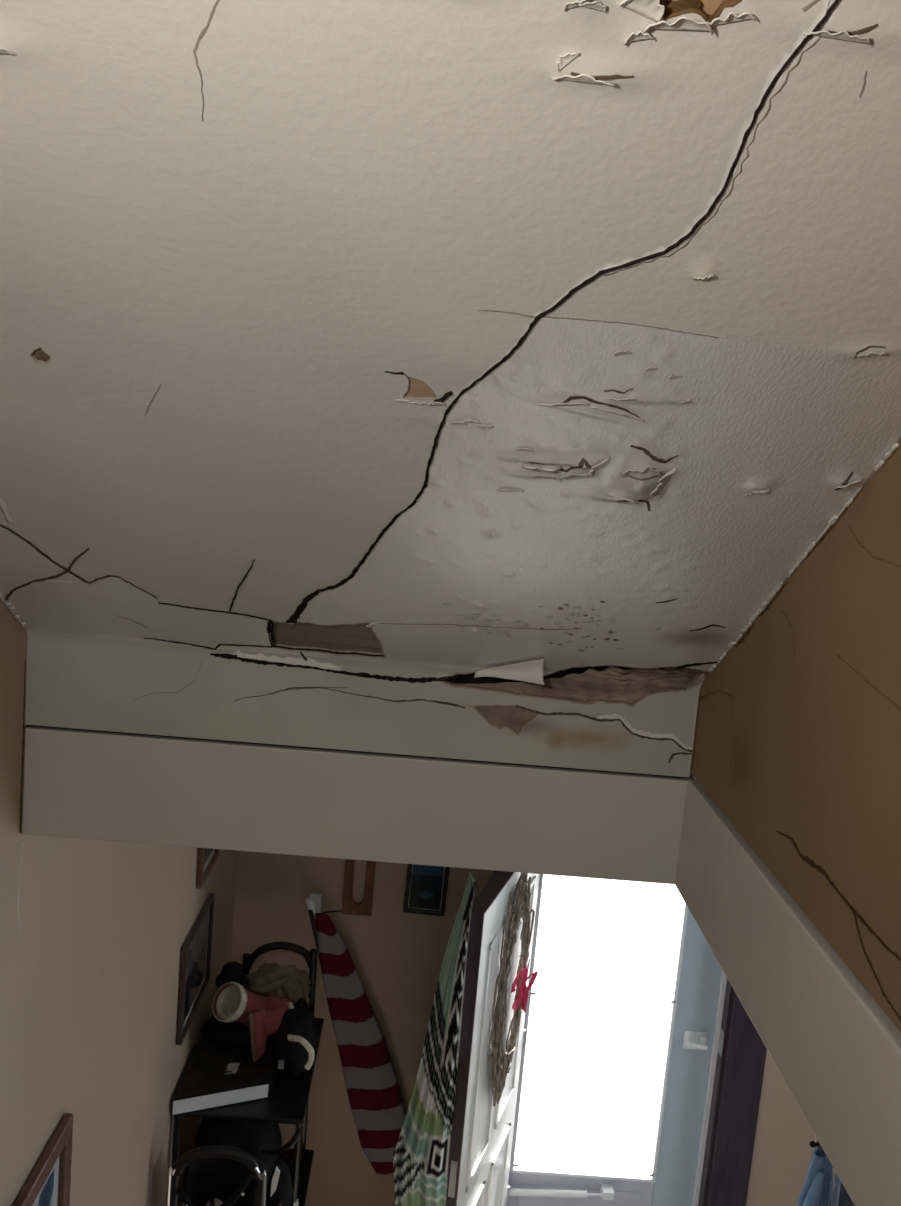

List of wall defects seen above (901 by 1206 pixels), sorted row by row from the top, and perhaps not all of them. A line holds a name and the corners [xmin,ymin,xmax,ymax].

flaking render [564,0,757,46]
peeling [550,52,634,88]
flaking render [29,347,51,365]
crack [0,0,839,708]
flaking render [385,371,446,406]
spalling [828,443,899,525]
flaking render [270,621,385,658]
flaking render [436,542,815,736]